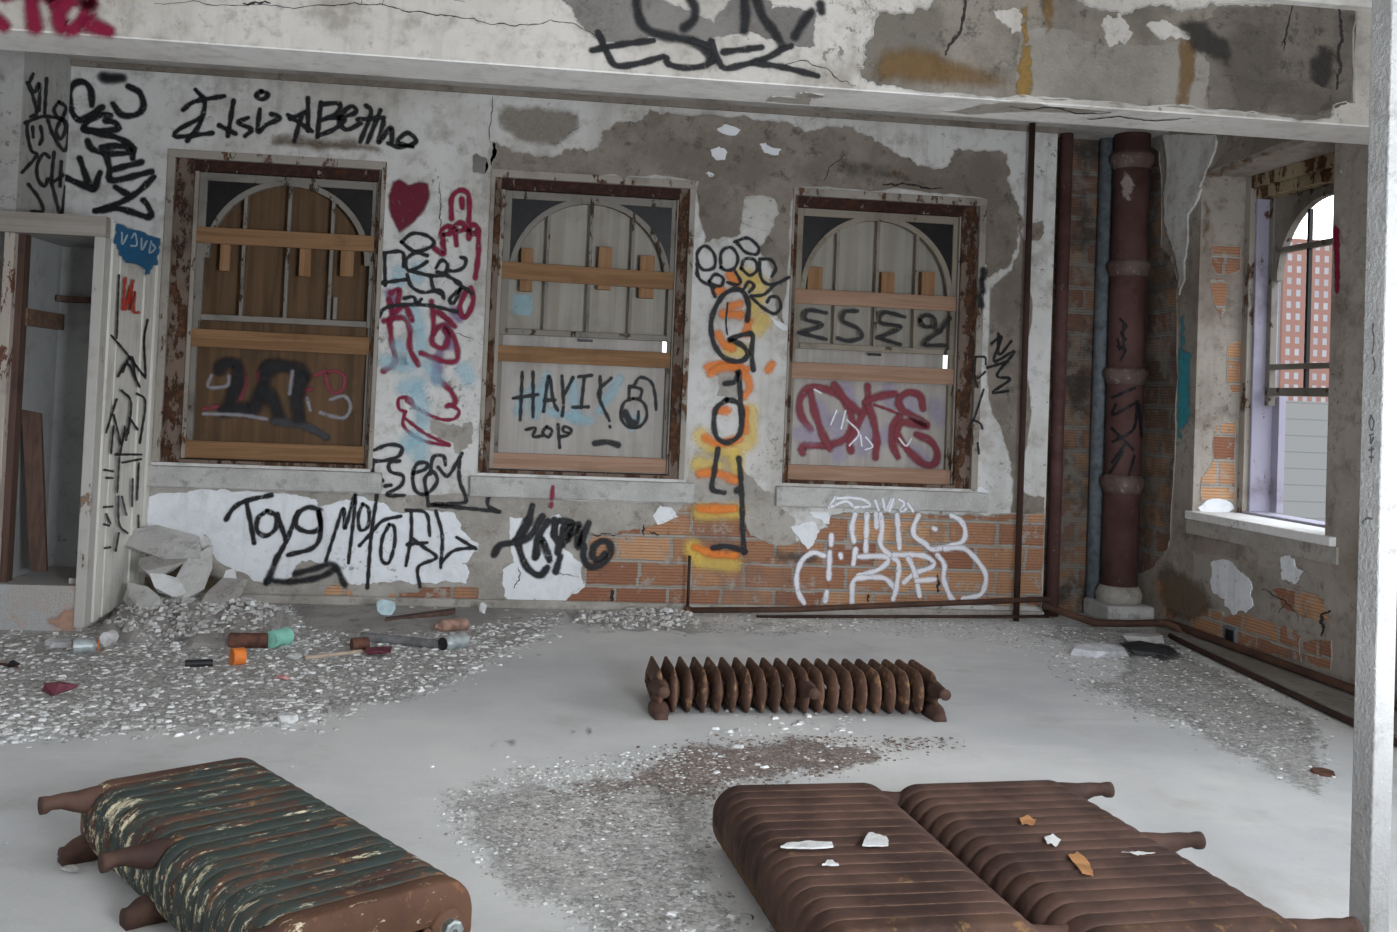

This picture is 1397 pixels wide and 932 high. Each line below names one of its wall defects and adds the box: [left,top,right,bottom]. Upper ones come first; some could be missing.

crack [154,0,597,36]
peeling [560,0,818,49]
crack [944,0,967,55]
rust [1016,7,1033,97]
spalling [858,0,1358,122]
flaking render [1206,136,1294,173]
flaking render [1210,245,1241,319]
flaking render [1226,341,1242,393]
flaking render [0,91,1045,746]
flaking render [1200,422,1236,501]
flaking render [1187,551,1333,670]